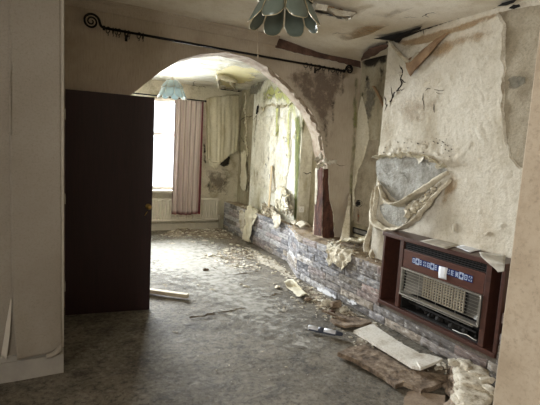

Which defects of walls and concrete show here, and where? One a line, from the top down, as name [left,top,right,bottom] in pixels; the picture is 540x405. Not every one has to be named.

peeling [254,104,295,193]
spalling [267,67,323,151]
leakage [293,72,344,130]
crack [384,65,406,109]
spalling [351,97,447,227]
spalling [396,41,433,62]
spalling [496,5,540,169]